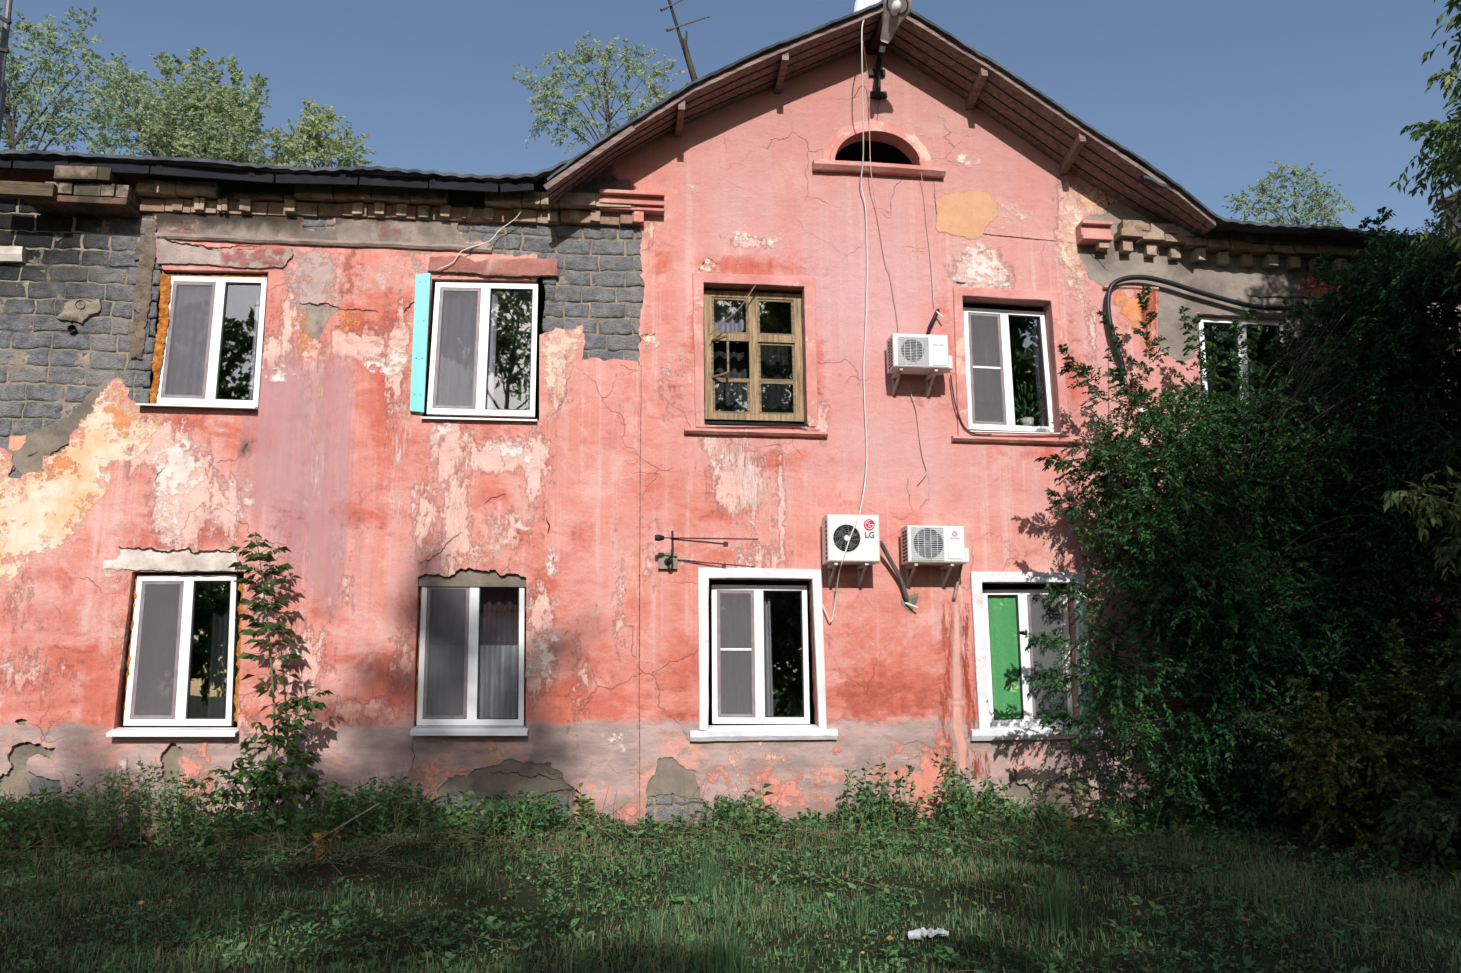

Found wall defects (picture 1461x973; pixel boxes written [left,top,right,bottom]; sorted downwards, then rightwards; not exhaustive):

flaking render [577,165,632,199]
peeling [935,190,1035,288]
flaking render [1055,184,1358,362]
spalling [0,173,659,587]
peeling [710,436,784,533]
spalling [0,742,62,801]
spalling [409,744,599,826]
spalling [617,741,844,825]
peeling [871,727,953,818]